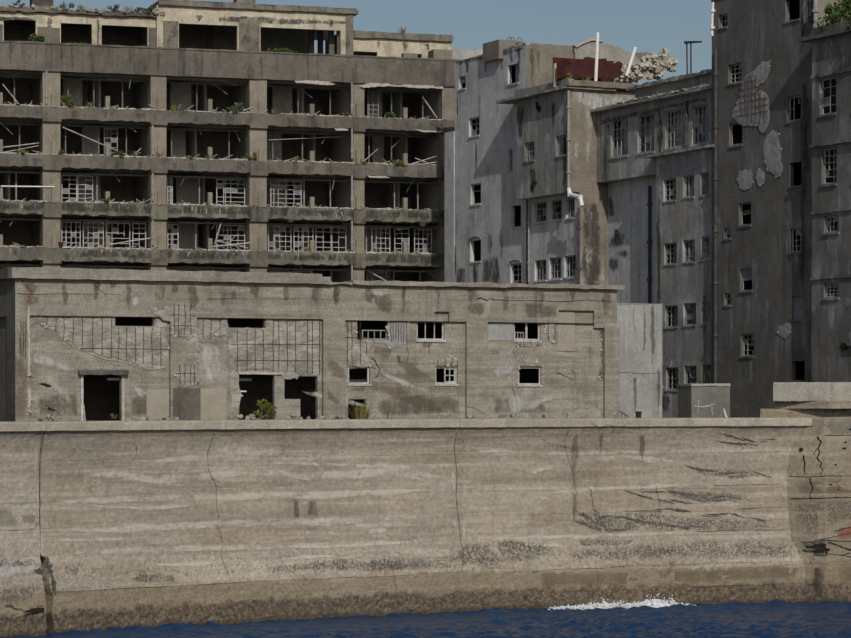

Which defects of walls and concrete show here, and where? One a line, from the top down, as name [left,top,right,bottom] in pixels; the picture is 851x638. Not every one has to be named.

flaking render [732,61,783,190]
water stain [583,205,599,285]
spalling [20,303,321,418]
spalling [345,320,411,368]
water stain [496,396,552,412]
crack [743,435,851,509]
crack [5,434,250,611]
crack [376,432,464,598]
crack [801,527,851,557]